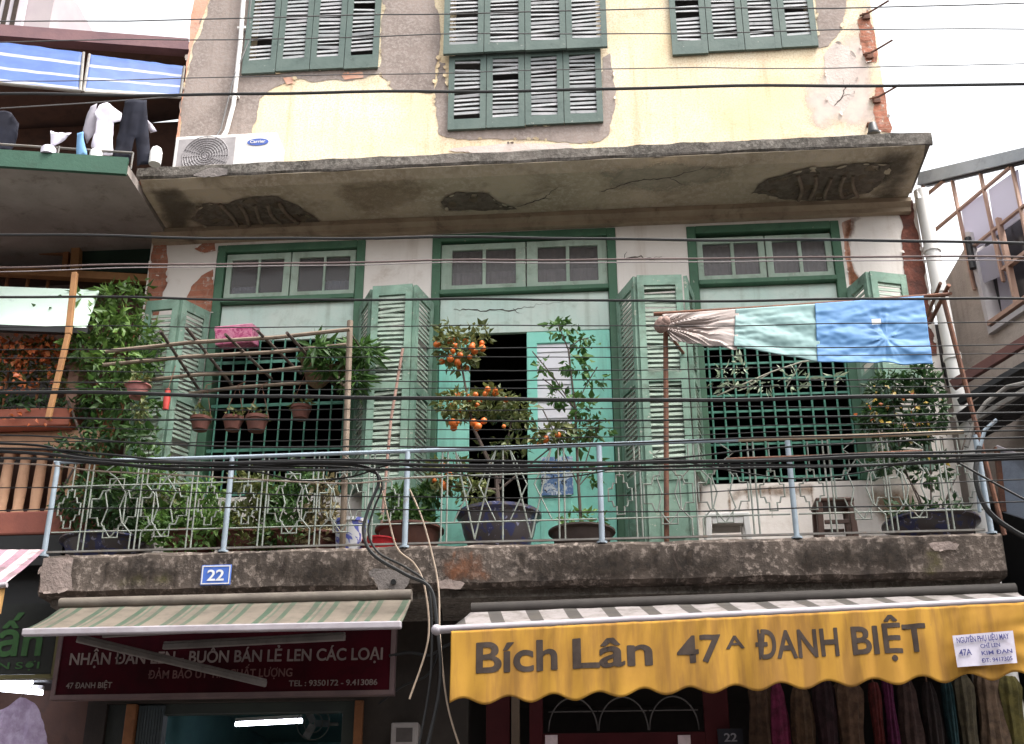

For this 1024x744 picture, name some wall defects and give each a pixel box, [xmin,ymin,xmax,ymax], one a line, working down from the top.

peeling [176,0,616,153]
flaking render [805,0,892,133]
spalling [191,196,320,228]
spalling [441,192,516,213]
crack [517,159,762,207]
spalling [752,163,891,203]
flaking render [195,243,216,253]
flaking render [842,219,854,285]
flaking render [142,245,169,329]
flaking render [187,270,214,313]
crack [457,301,564,313]
flaking render [899,200,937,356]